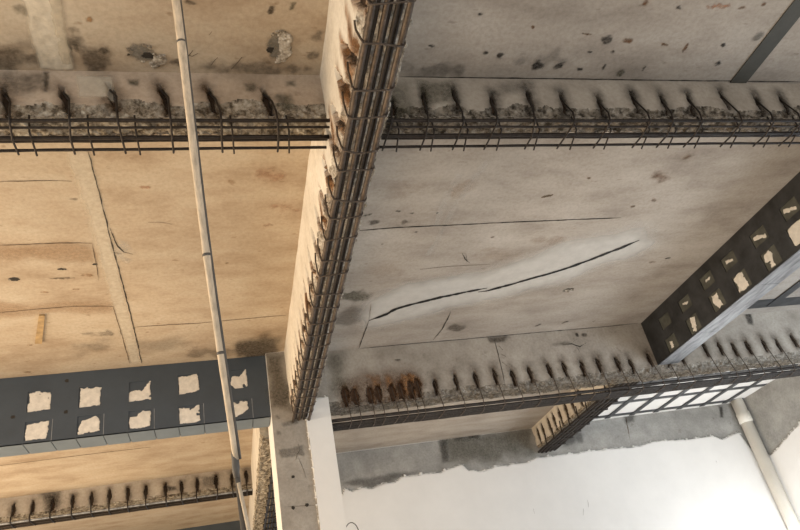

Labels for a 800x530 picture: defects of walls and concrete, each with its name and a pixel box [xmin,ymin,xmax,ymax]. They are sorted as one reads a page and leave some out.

spalling [379,87,800,144]
crack [2,153,285,363]
peeling [0,0,407,530]
crack [359,240,639,384]
spalling [329,335,800,416]
peeling [743,376,800,455]